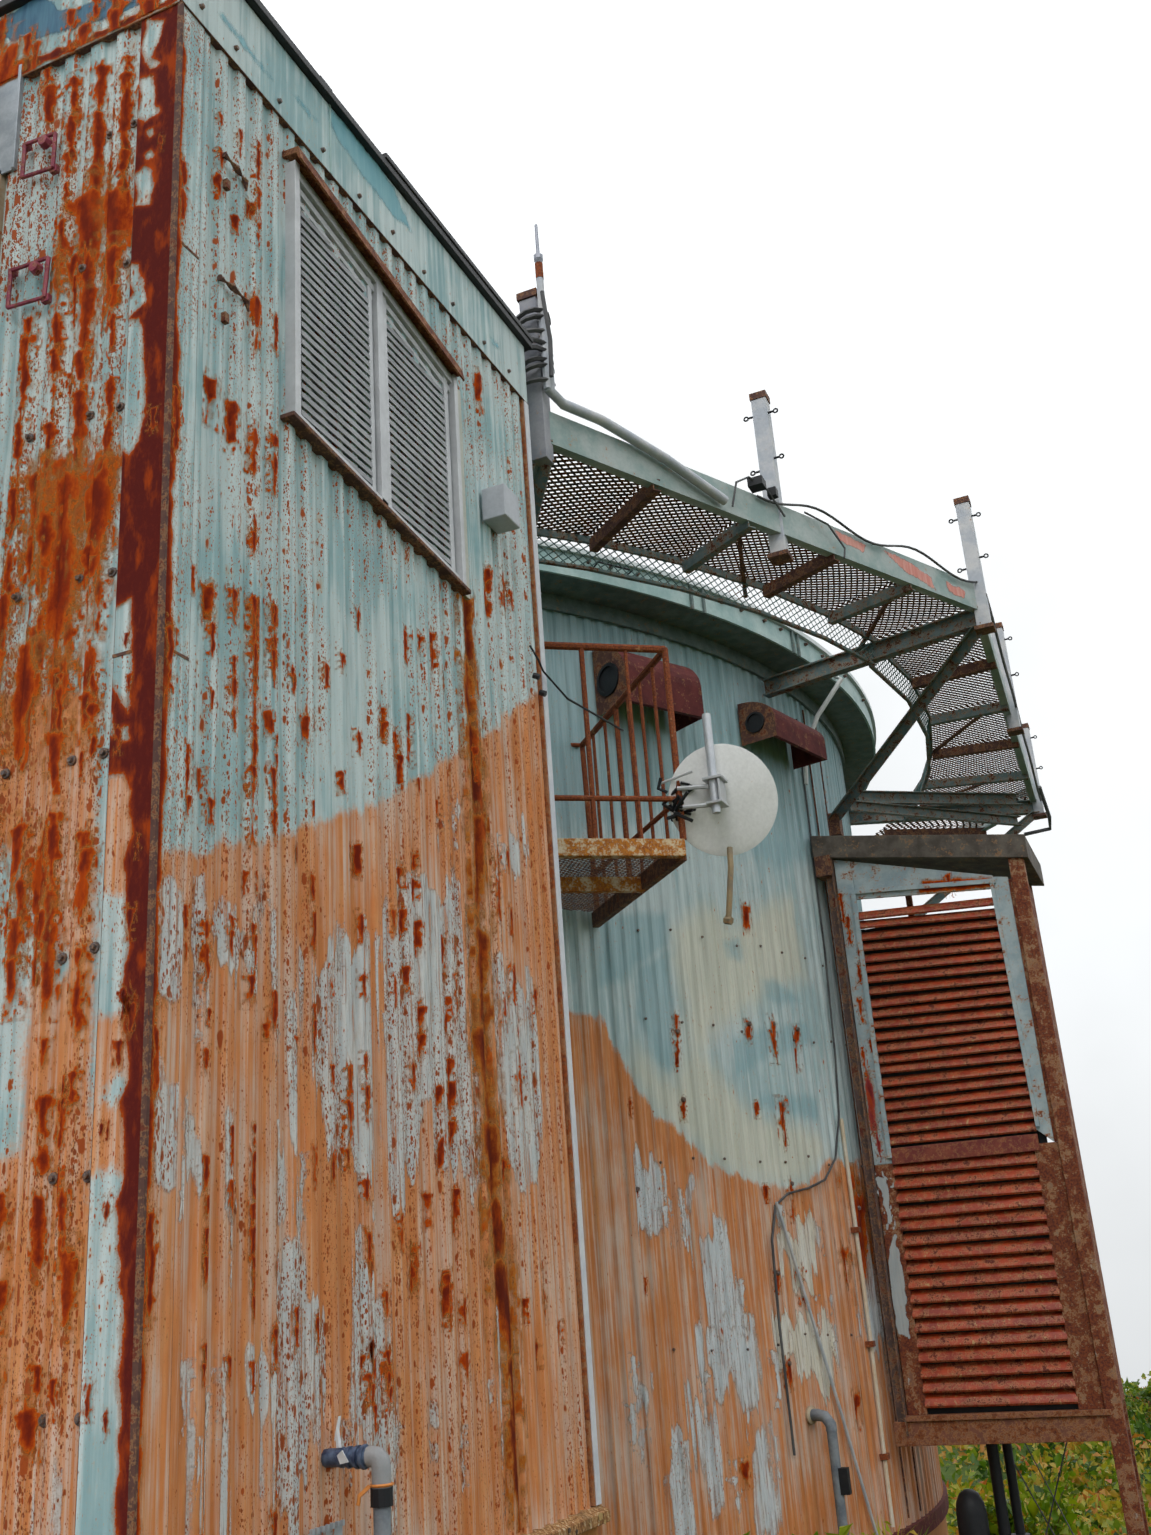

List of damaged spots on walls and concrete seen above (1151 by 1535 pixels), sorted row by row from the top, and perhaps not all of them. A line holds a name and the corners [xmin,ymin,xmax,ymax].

rust [211,112,263,245]
rust [202,370,279,556]
rust [0,0,217,1535]
rust [191,565,297,897]
rust [351,704,439,816]
peeling [492,812,529,881]
rust [386,565,565,1534]
peeling [491,951,543,1194]
peeling [153,859,483,1535]
peeling [488,1306,506,1517]
peeling [633,1143,840,1535]
peeling [851,1214,890,1391]